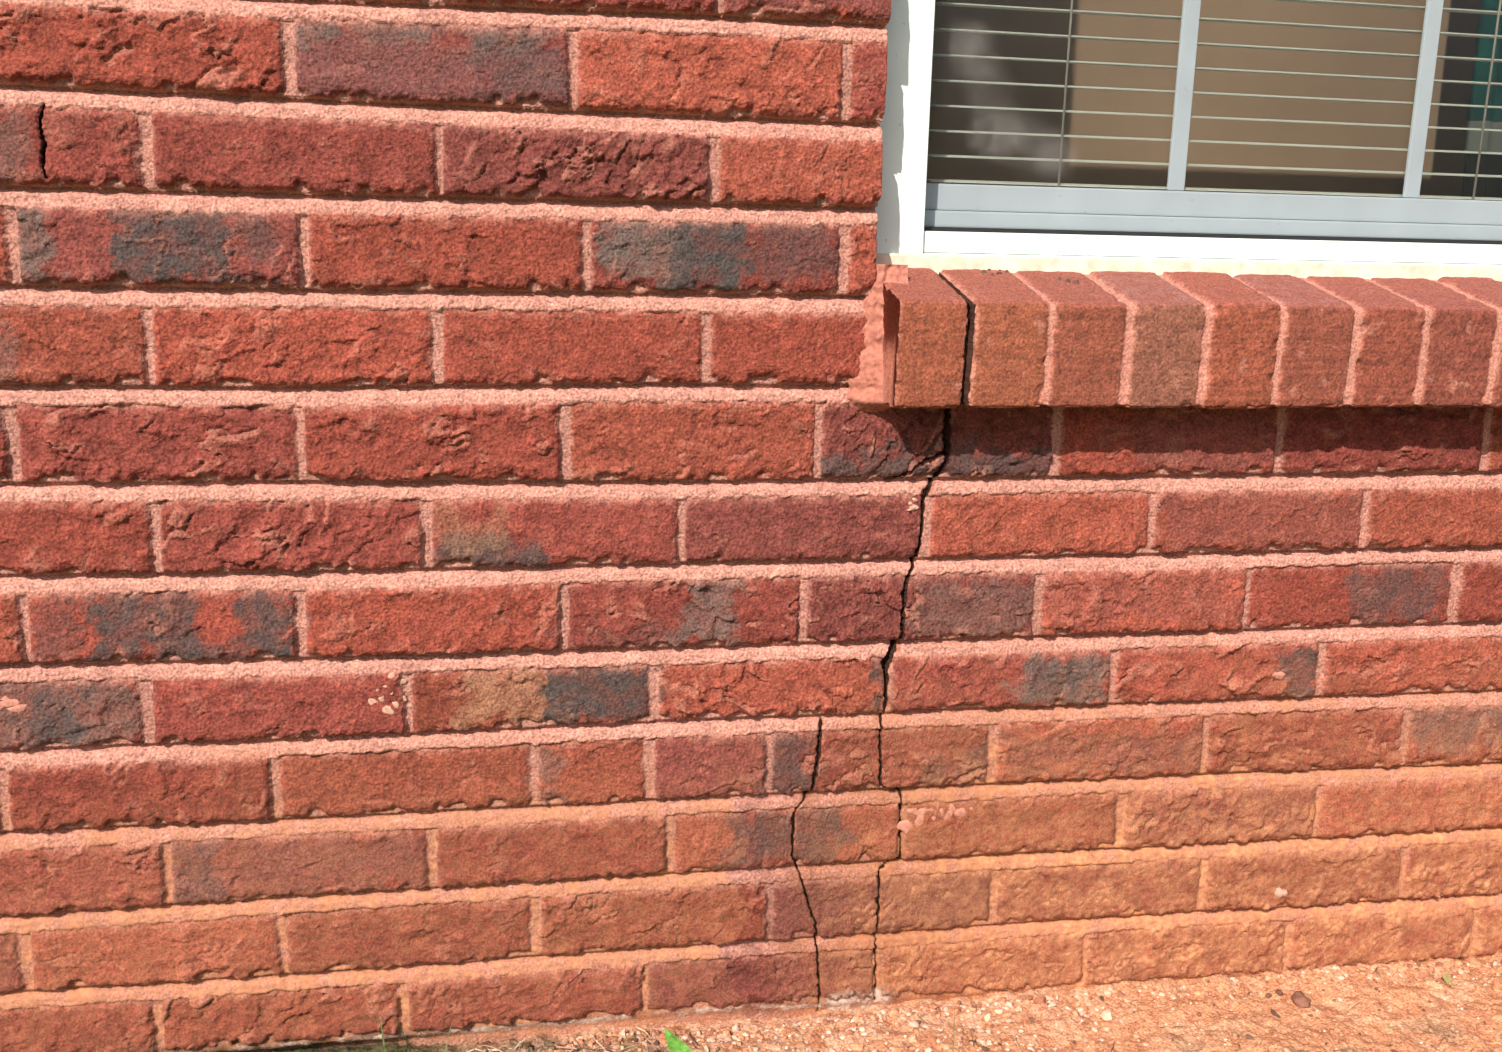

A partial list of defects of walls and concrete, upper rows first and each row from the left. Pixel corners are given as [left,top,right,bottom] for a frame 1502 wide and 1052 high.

crack [791,719,822,1010]
crack [873,272,976,998]